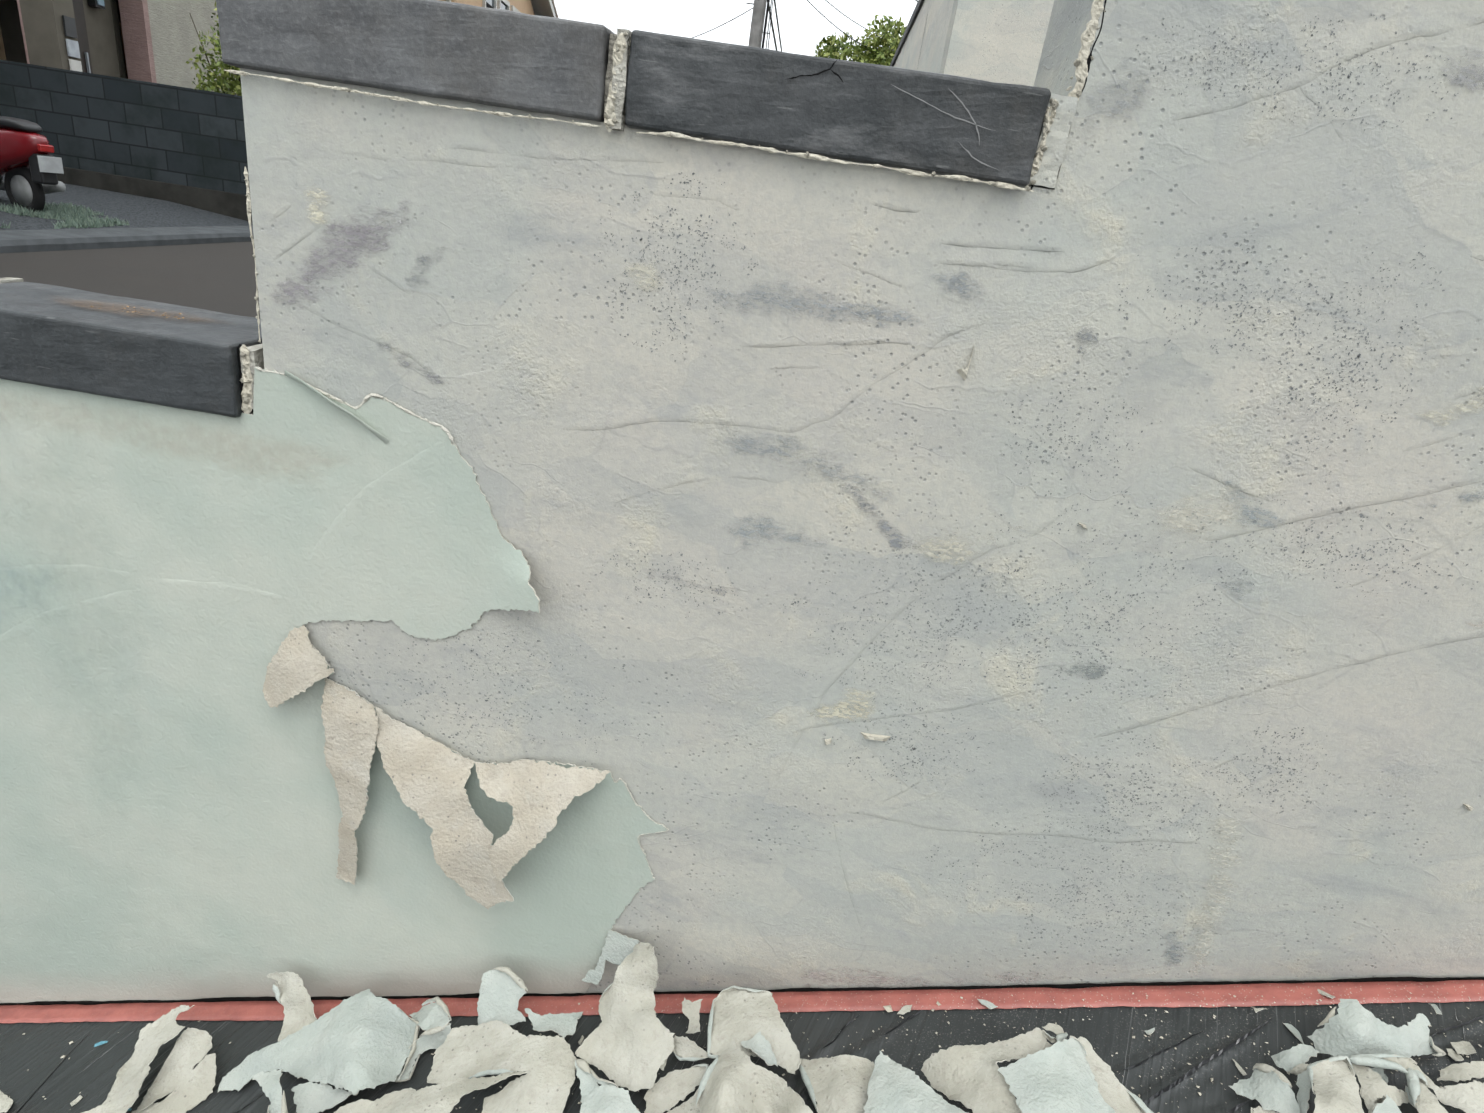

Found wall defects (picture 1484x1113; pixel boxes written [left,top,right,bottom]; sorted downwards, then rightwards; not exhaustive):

peeling [0,167,1154,1113]